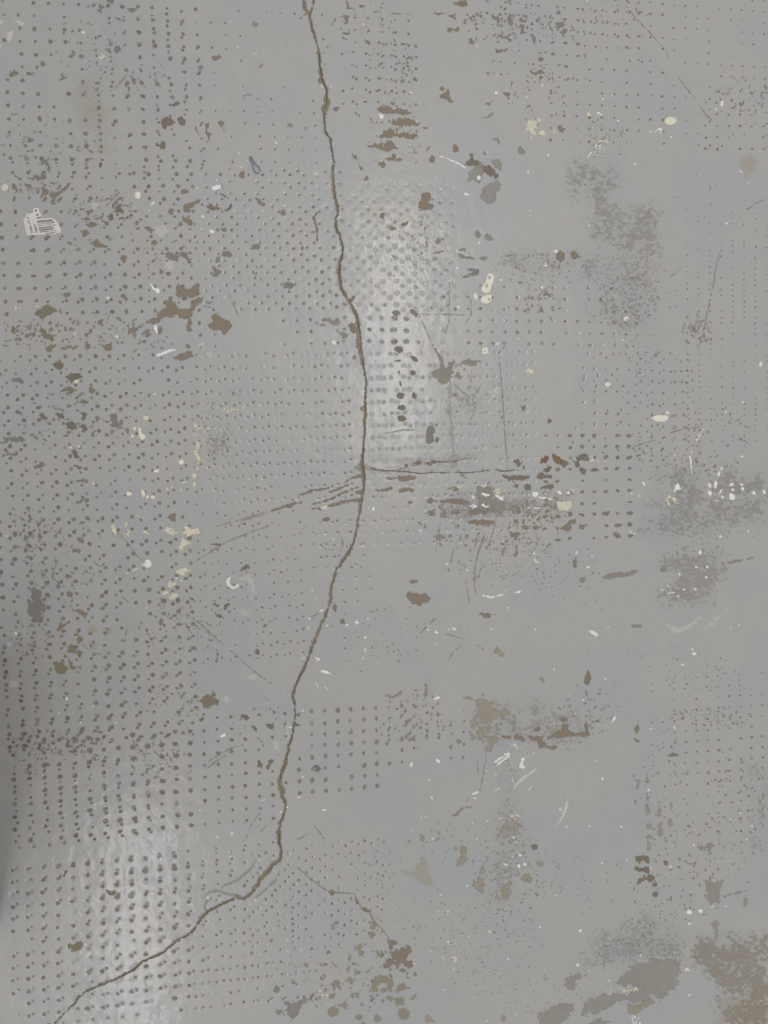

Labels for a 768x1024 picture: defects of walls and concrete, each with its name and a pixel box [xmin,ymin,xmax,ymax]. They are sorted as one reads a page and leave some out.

crack [54,0,513,1024]
peeling [0,0,619,849]
peeling [10,646,768,1024]
peeling [354,162,768,602]